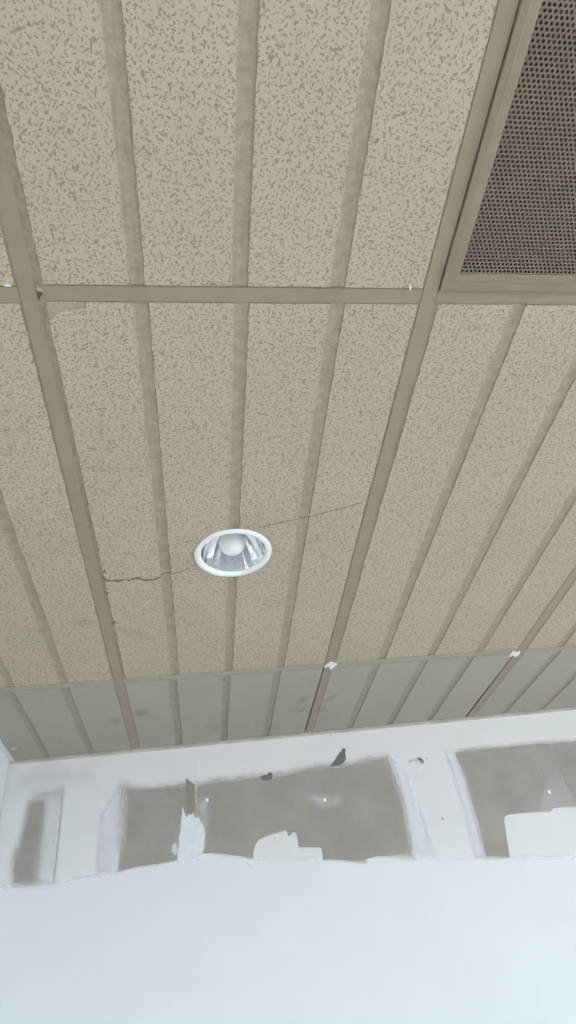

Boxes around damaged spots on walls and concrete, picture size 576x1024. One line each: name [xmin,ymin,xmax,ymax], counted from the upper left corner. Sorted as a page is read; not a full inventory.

crack [252,503,361,547]
crack [102,540,194,582]